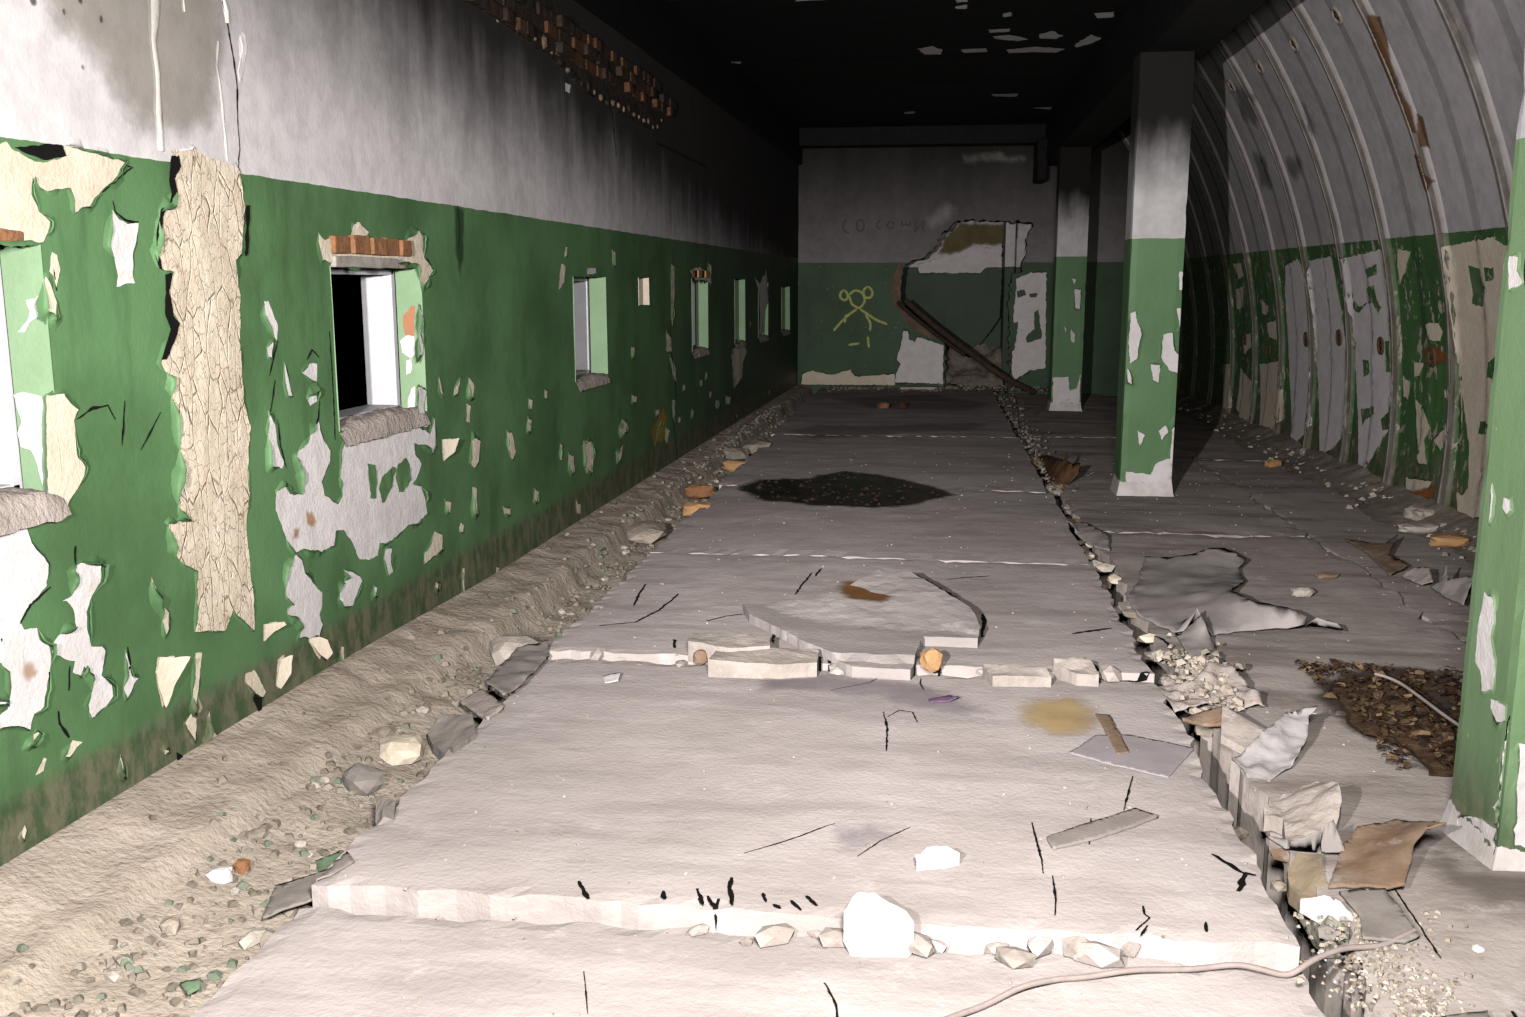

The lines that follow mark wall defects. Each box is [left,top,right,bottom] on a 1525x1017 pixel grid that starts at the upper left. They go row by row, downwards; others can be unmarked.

corrosion [1367,16,1433,191]
crack [102,155,181,360]
spalling [0,136,481,698]
water stain [739,471,952,507]
peeling [799,245,1085,405]
peeling [1222,229,1524,527]
peeling [0,528,218,775]
crack [1072,628,1180,683]
peeling [1457,587,1525,856]
crack [1031,822,1057,915]
crack [1136,905,1150,936]
crack [1212,854,1256,892]